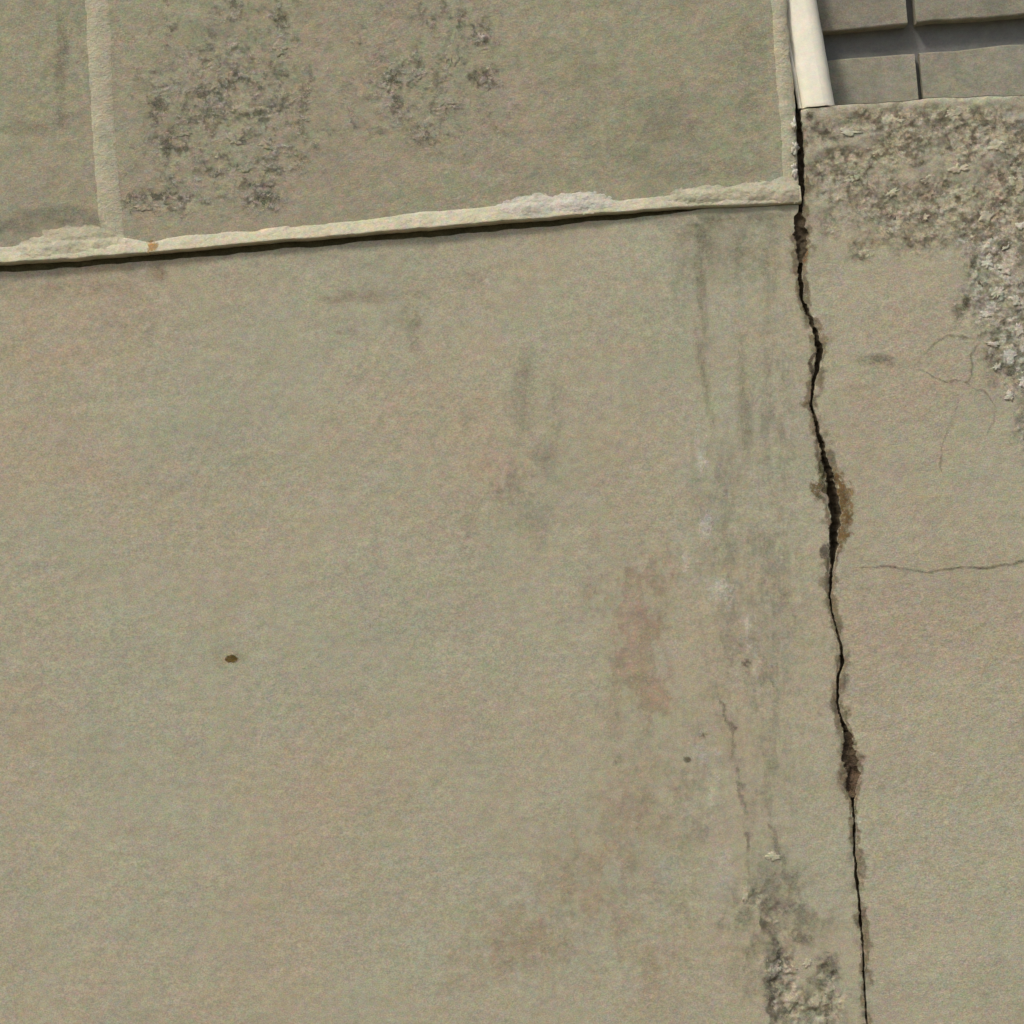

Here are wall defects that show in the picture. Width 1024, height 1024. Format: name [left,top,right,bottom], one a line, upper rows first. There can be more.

spalling [806,106,1024,401]
crack [791,113,873,1024]
spalling [764,942,842,1024]